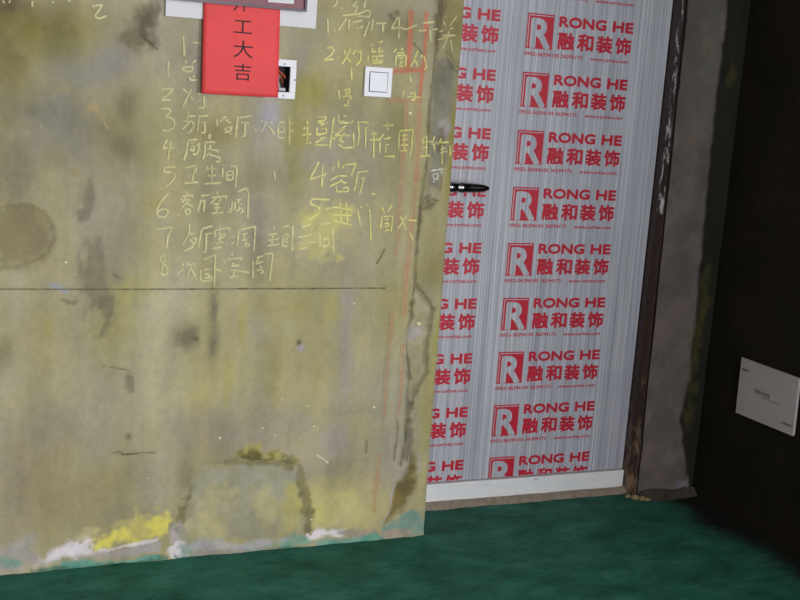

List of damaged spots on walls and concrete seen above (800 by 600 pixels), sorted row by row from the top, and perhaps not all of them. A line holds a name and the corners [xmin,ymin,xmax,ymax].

crack [413,2,459,208]
damp [0,195,63,276]
crack [399,233,437,468]
damp [0,503,385,575]